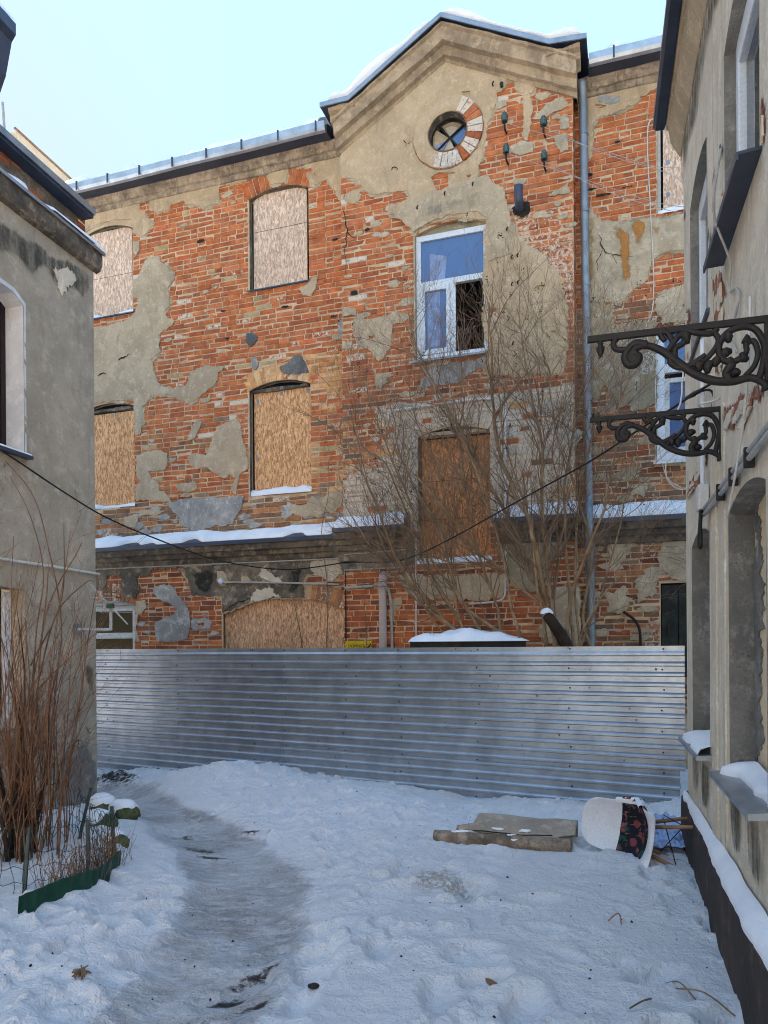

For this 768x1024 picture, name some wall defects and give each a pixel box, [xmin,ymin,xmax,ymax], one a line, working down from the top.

damp [0,225,88,296]
peeling [53,266,76,296]
crack [596,235,633,271]
corrosion [616,221,657,279]
spalling [94,298,138,327]
spalling [127,82,690,648]
spalling [97,567,228,649]